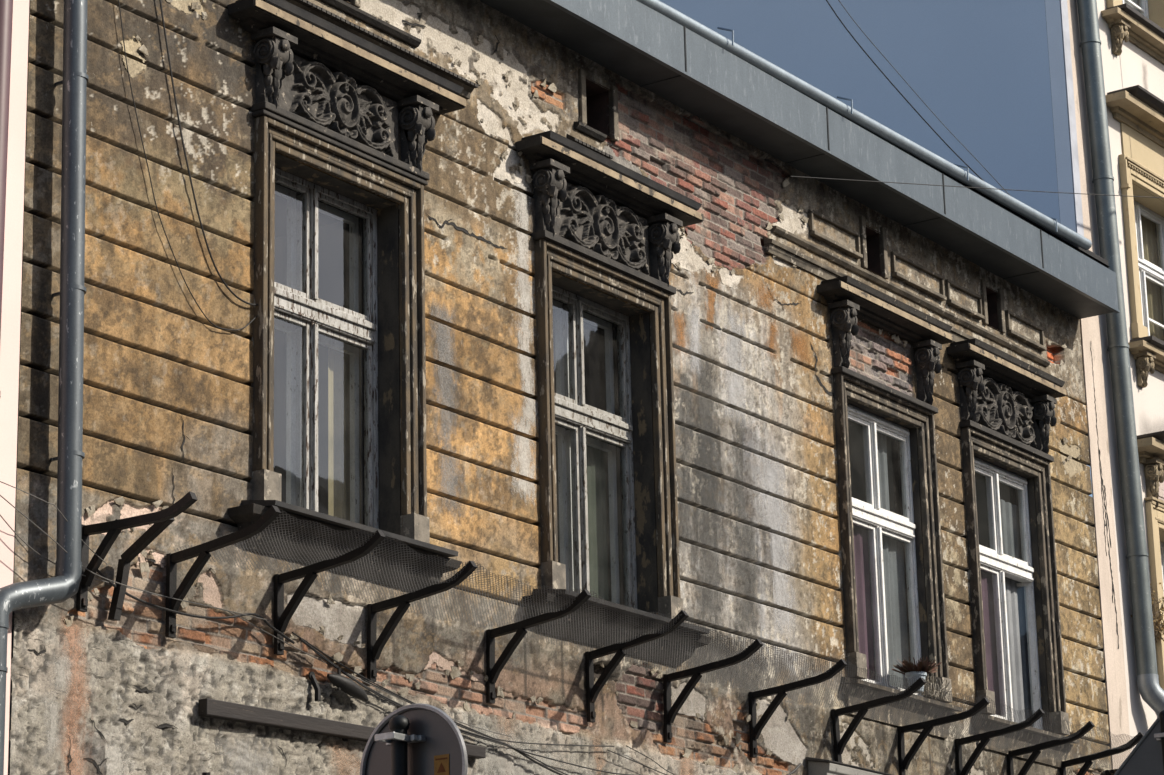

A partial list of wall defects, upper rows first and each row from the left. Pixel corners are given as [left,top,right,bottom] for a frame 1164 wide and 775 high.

peeling [121,35,149,78]
peeling [165,0,215,20]
peeling [359,0,563,186]
flaking render [603,84,809,288]
damp [727,318,744,414]
flaking render [848,321,913,396]
peeling [82,496,169,535]
damp [681,315,723,622]
damp [735,428,792,633]
flaking render [64,549,592,735]
flaking render [585,661,807,775]
damp [688,636,759,702]